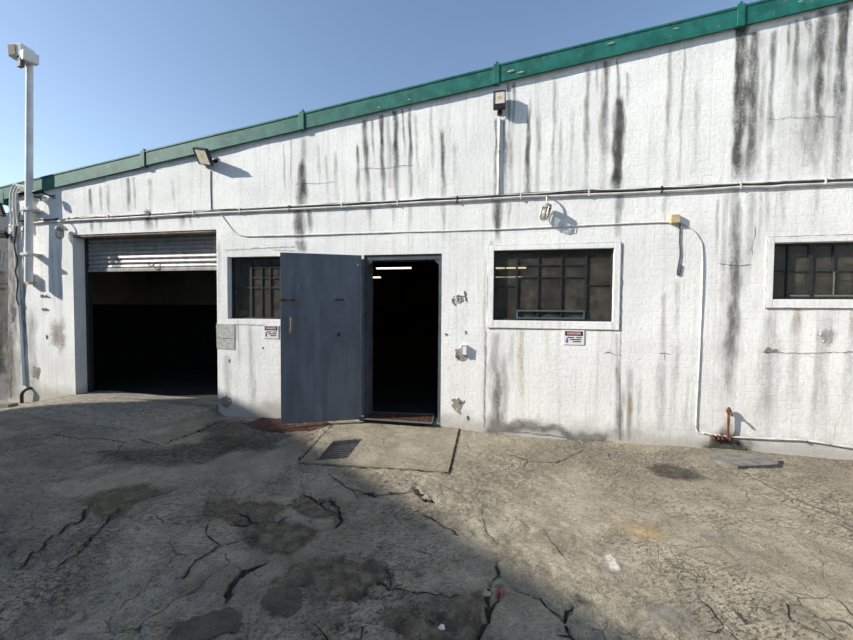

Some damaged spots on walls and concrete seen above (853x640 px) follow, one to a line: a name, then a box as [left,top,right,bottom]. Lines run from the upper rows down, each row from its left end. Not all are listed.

water stain [732,25,757,172]
water stain [815,10,828,129]
water stain [835,5,849,106]
water stain [356,116,384,180]
water stain [393,108,412,176]
water stain [602,99,624,185]
flaking render [451,398,470,421]
crack [20,506,120,569]
crack [224,563,267,604]
crack [477,587,491,640]
crack [563,606,574,640]
crack [786,603,830,640]